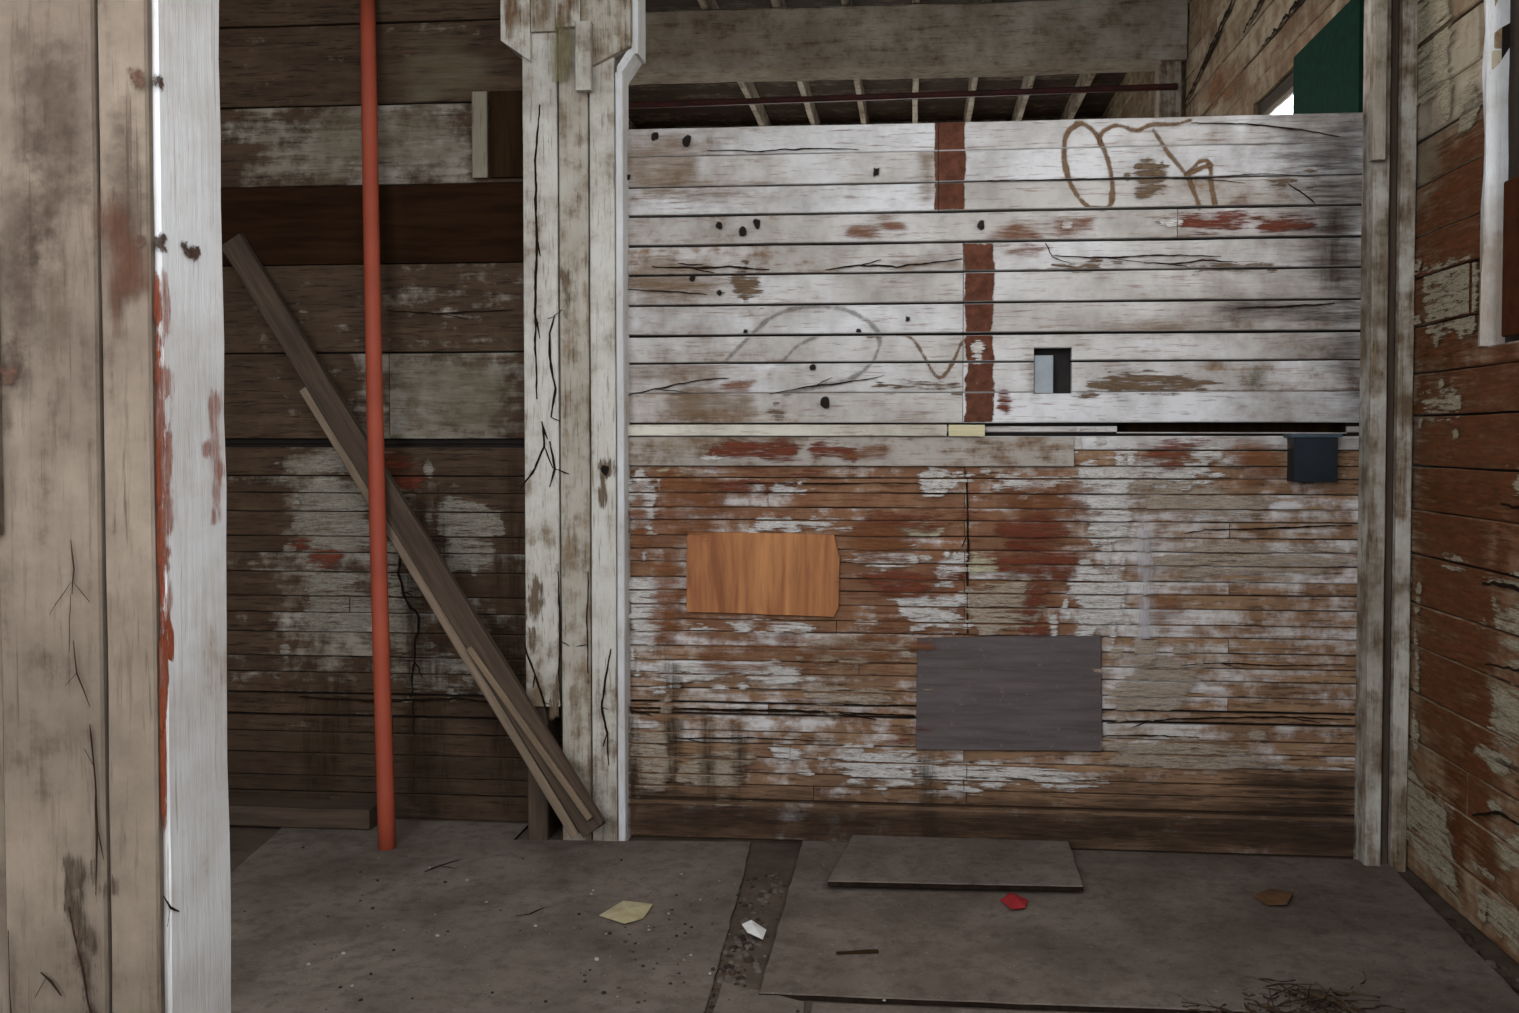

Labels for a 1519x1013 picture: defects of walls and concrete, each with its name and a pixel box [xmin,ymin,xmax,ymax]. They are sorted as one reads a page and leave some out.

crack [1185,0,1340,137]
crack [987,173,1320,204]
crack [387,105,569,489]
peeling [1413,251,1480,347]
peeling [871,379,962,398]
peeling [1075,369,1223,398]
peeling [1418,376,1462,443]
peeling [598,419,1303,807]
peeling [1145,541,1358,583]
crack [1482,581,1519,592]
peeling [1406,551,1519,948]